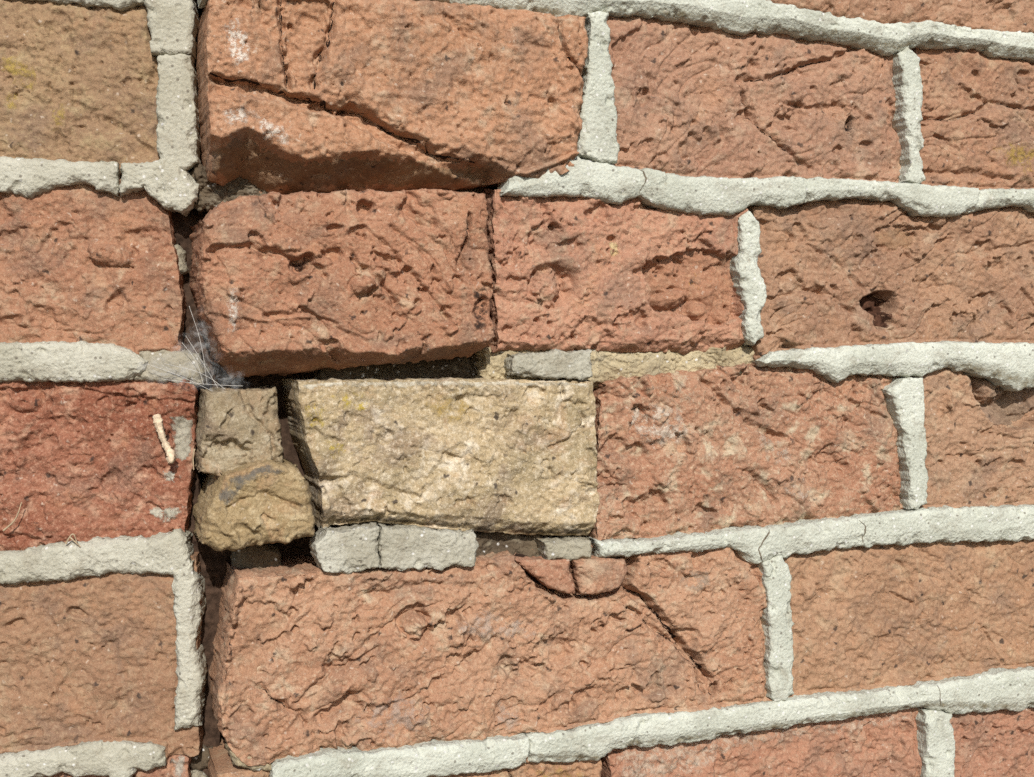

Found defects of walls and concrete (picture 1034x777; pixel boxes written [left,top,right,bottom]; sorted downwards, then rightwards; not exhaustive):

crack [210,1,475,163]
crack [171,208,315,477]
crack [188,467,231,777]
crack [270,526,318,557]
crack [513,553,555,593]
crack [622,586,711,695]